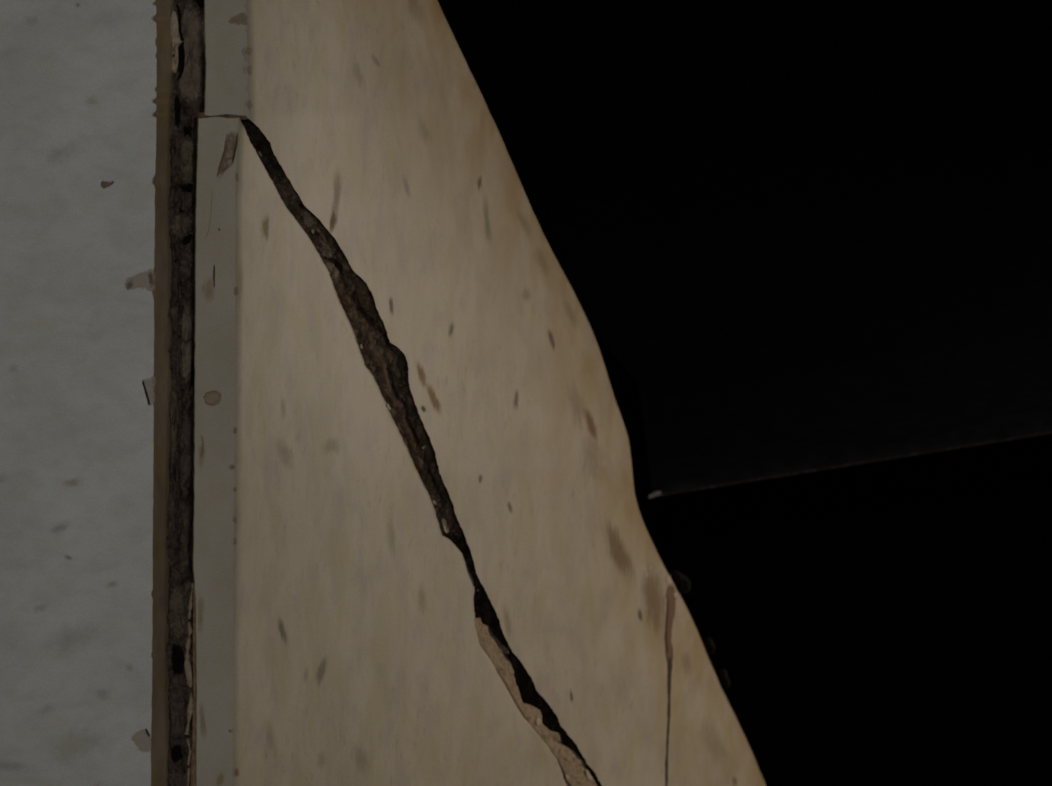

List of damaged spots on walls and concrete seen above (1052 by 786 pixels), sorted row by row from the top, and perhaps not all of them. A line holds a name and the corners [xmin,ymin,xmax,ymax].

crack [198,112,602,786]
crack [665,576,676,786]